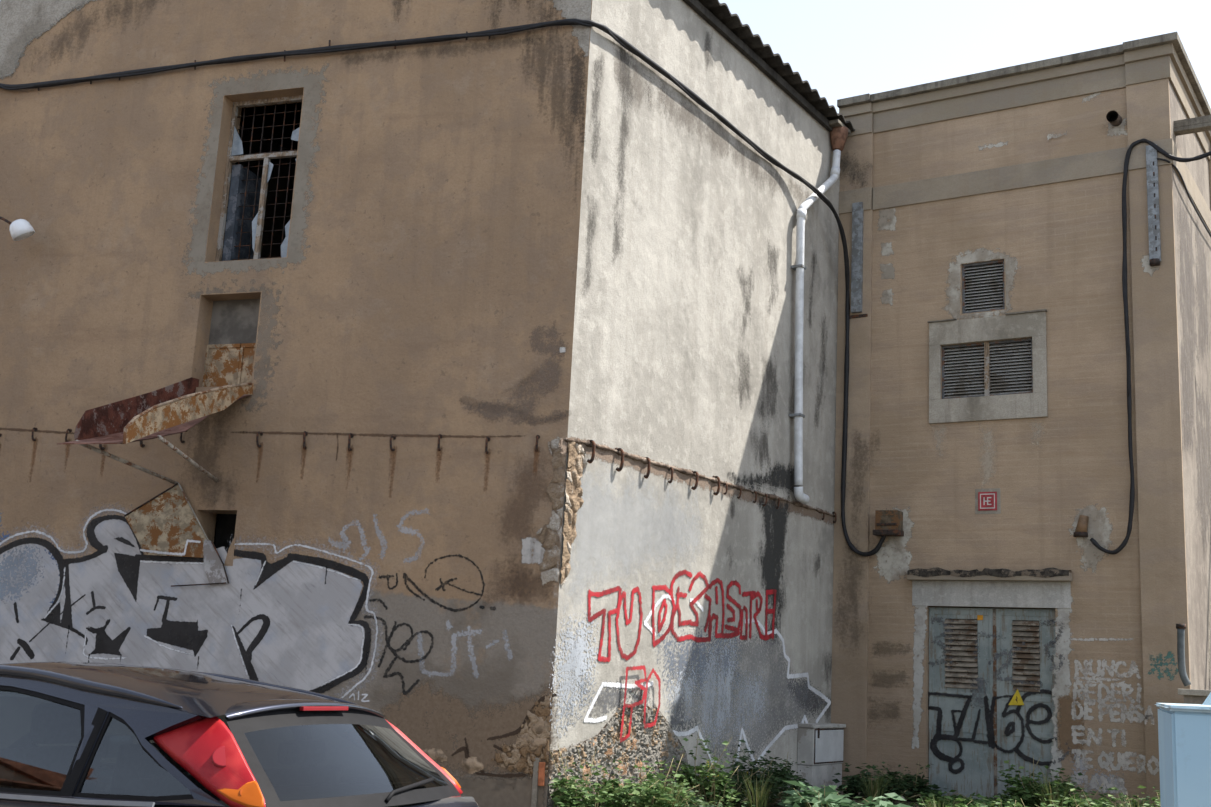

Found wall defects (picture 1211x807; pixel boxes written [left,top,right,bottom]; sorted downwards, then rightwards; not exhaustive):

leakage [619,47,630,182]
leakage [759,363,777,415]
corrosion [124,483,236,587]
spalling [536,437,834,585]
leakage [728,433,799,643]
spalling [381,681,688,807]